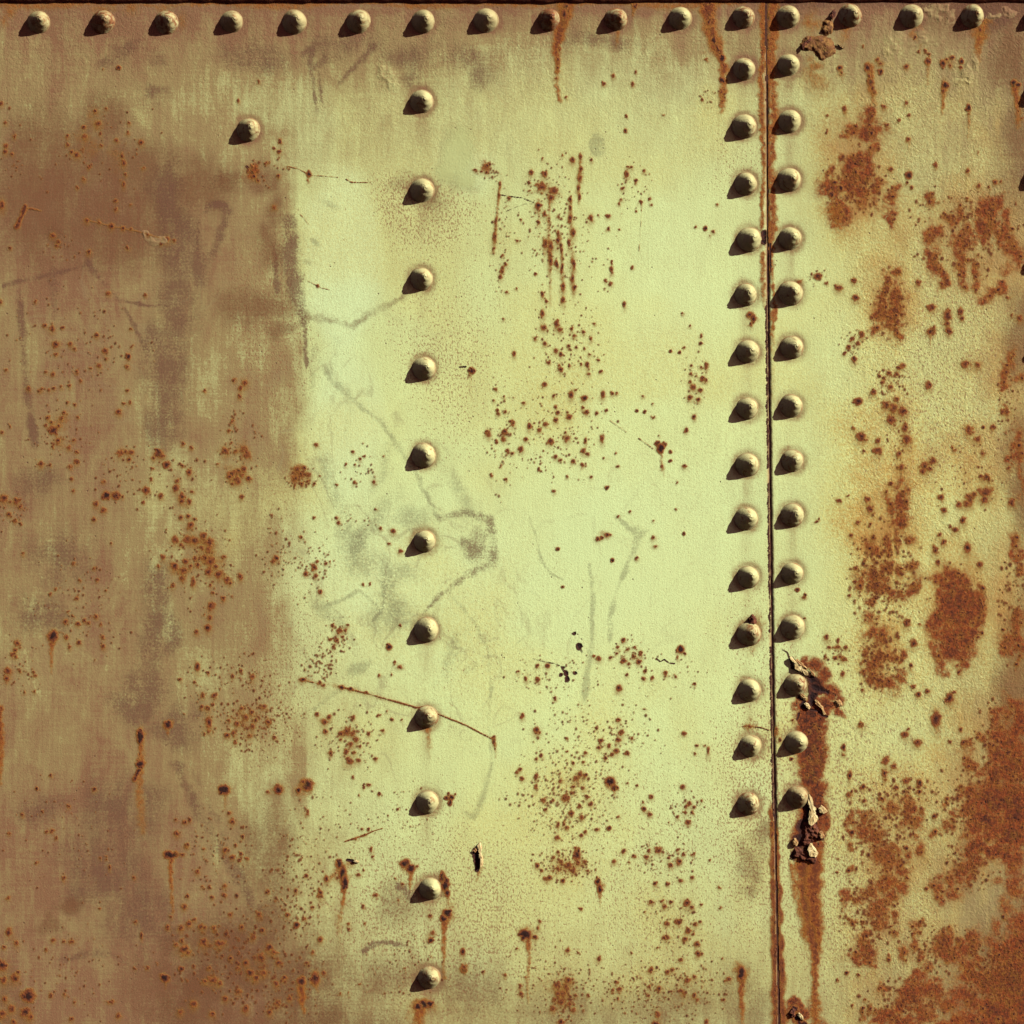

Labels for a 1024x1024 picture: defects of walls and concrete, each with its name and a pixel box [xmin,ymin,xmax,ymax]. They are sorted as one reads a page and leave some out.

rust [618,2,742,113]
rust [757,2,780,337]
rust [817,57,1024,305]
rust [473,149,653,492]
rust [92,410,263,634]
rust [132,623,437,1024]
peeling [472,842,483,875]
rust [499,634,708,898]
rust [499,784,746,1024]
spalling [770,646,843,817]
peeling [791,794,828,864]
rust [768,352,1024,1024]